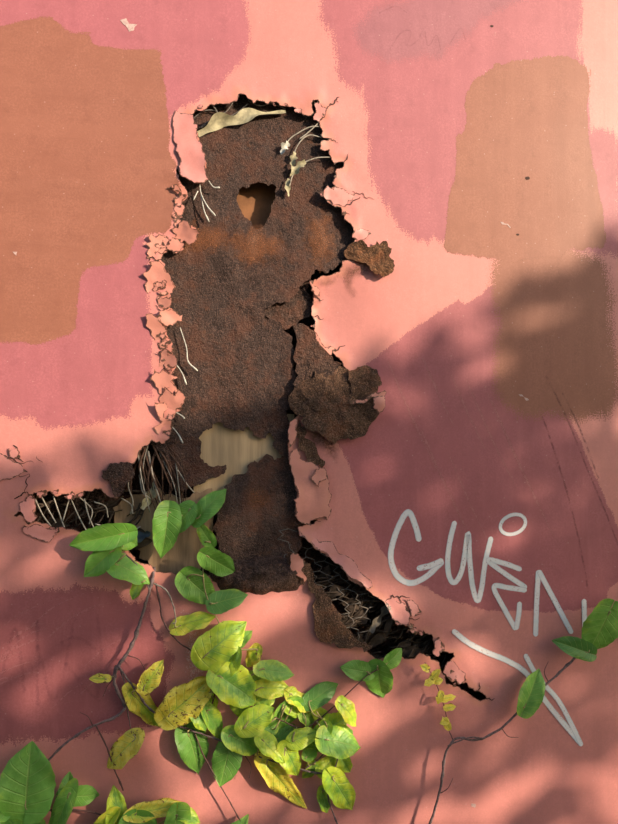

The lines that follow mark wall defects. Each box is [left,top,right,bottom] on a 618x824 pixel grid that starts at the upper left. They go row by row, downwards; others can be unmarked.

peeling [313,102,328,123]
peeling [320,174,355,215]
peeling [352,228,371,241]
peeling [143,104,208,436]
peeling [315,332,337,355]
rust [150,95,395,652]
crack [1,445,42,499]
peeling [19,489,84,542]
peeling [288,417,373,589]
peeling [385,597,425,636]
peeling [432,637,466,687]